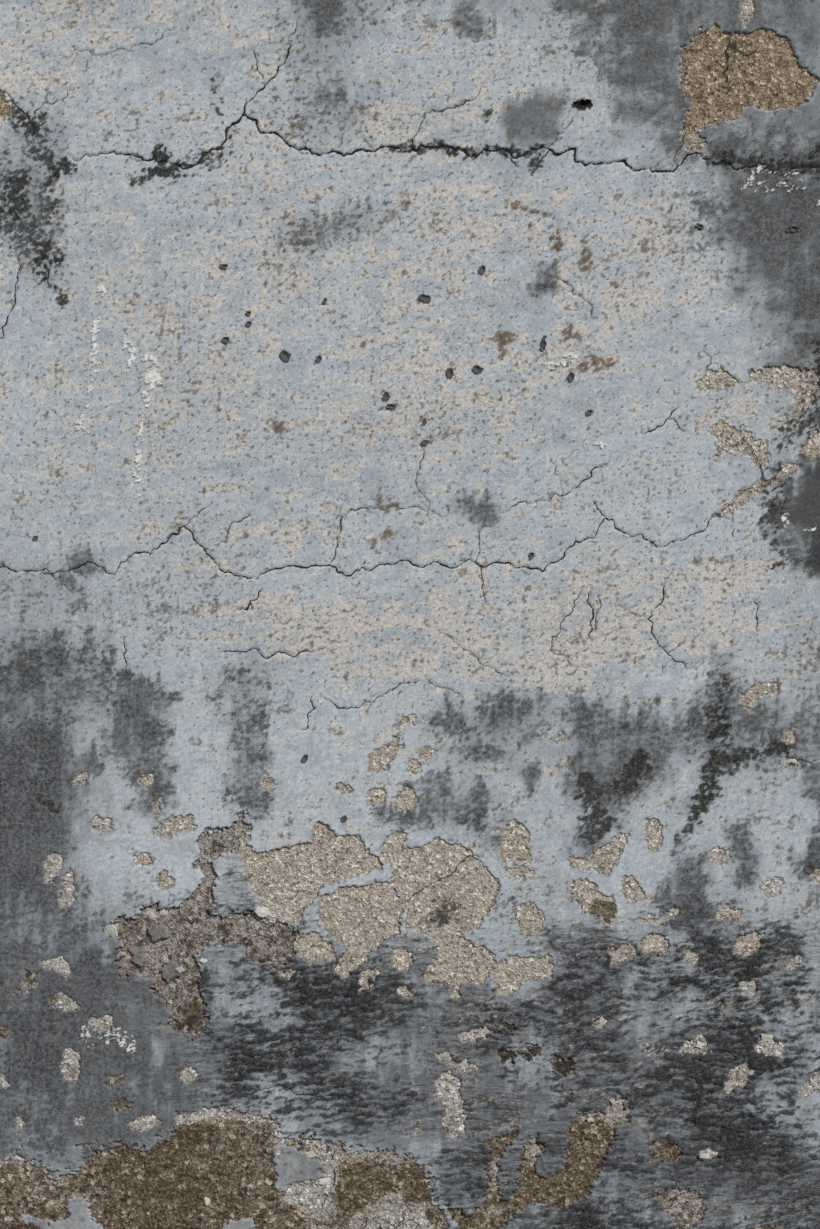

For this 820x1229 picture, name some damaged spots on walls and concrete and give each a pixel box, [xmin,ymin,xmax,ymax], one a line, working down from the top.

mould [0,106,77,309]
crack [58,18,820,176]
damp [389,95,566,174]
flaking render [678,0,820,151]
crack [0,248,58,339]
damp [571,0,820,576]
crack [644,407,684,434]
crack [0,435,794,676]
flaking render [103,772,554,1037]
damp [655,671,820,1075]
flaking render [0,1073,633,1229]
flaking render [433,1022,575,1140]